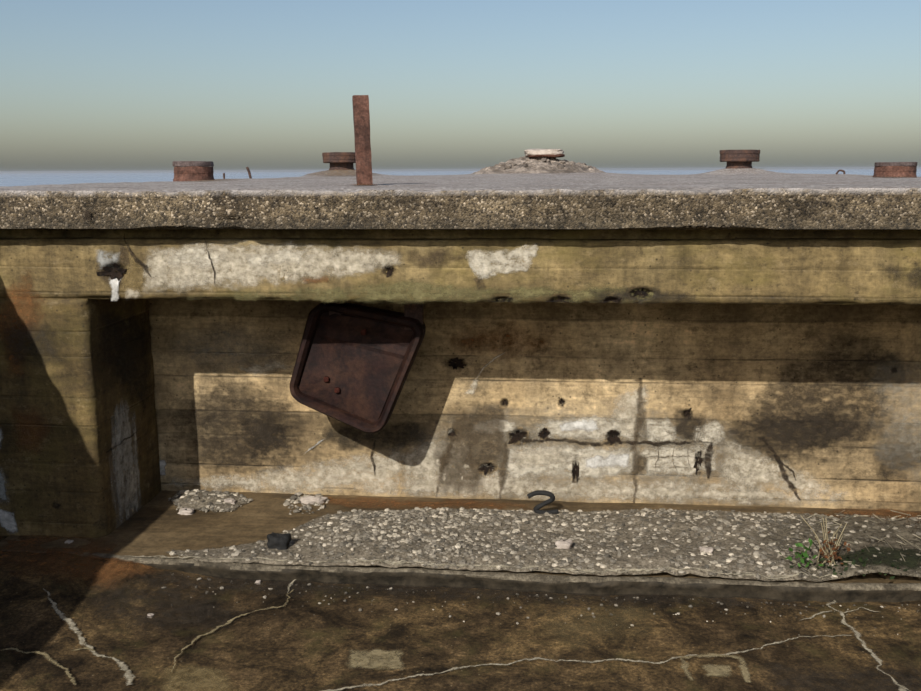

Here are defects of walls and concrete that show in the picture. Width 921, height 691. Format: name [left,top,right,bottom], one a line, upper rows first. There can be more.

damp [98,251,117,268]
damp [127,243,397,297]
peeling [468,245,537,289]
damp [174,331,921,503]
damp [111,405,140,518]
crack [762,437,800,500]
crack [3,589,135,685]
crack [172,589,294,670]
crack [323,600,910,691]